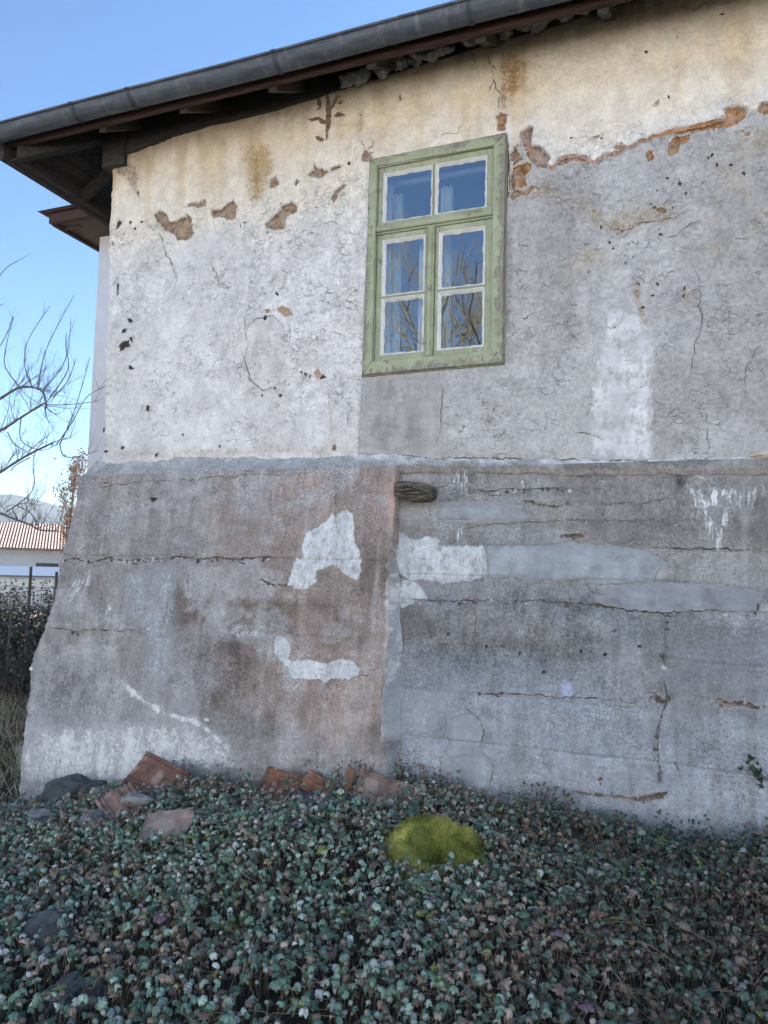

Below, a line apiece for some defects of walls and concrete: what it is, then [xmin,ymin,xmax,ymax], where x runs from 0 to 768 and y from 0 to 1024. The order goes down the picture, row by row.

water stain [246,146,272,198]
spalling [496,101,768,206]
spalling [115,199,245,241]
spalling [264,201,298,231]
crack [682,270,765,460]
crack [61,473,306,588]
peeling [287,509,362,590]
peeling [385,474,488,608]
water stain [674,475,765,550]
peeling [273,634,361,684]
crack [398,574,765,796]
spalling [709,697,766,711]